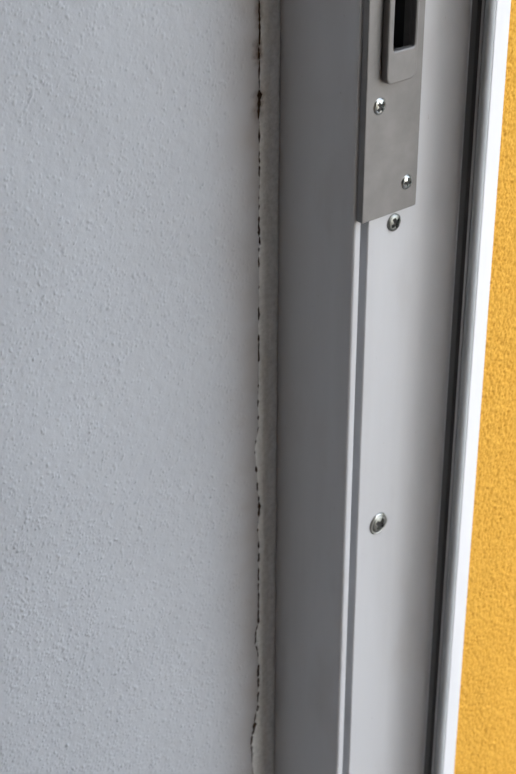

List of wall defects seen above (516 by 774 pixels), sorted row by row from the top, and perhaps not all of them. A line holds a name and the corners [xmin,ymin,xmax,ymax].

crack [255,0,263,267]
crack [251,307,261,773]